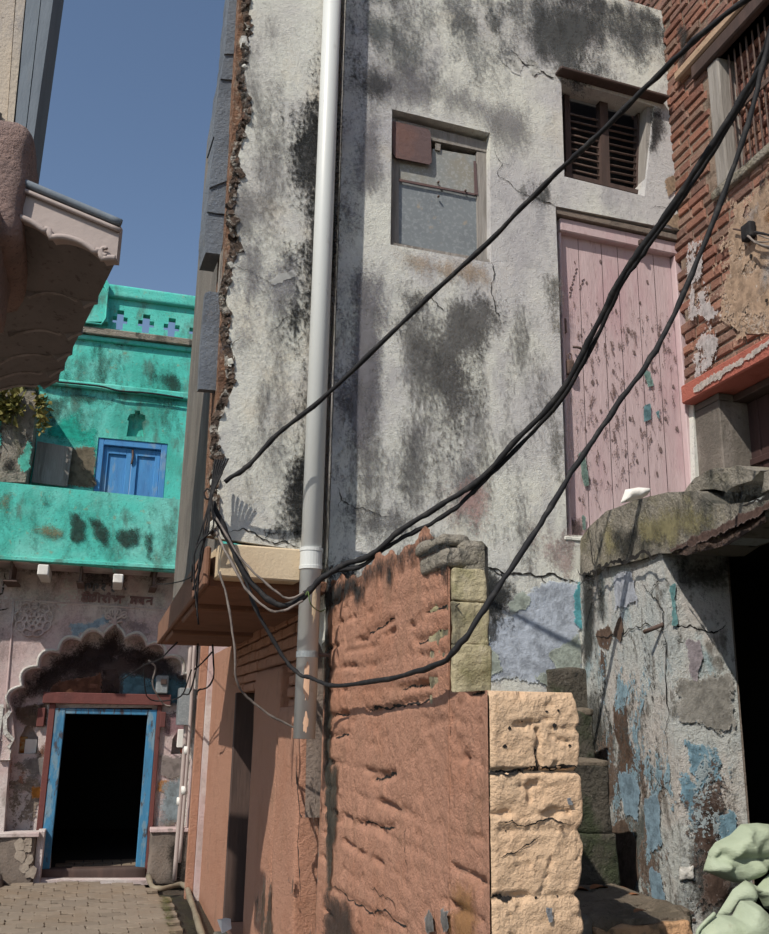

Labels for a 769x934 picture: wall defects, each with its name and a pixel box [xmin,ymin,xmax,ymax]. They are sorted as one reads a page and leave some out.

damp [444,0,665,91]
spalling [207,0,254,537]
damp [235,52,319,414]
peeling [694,163,769,344]
damp [335,268,539,539]
flaking render [35,526,63,538]
damp [70,513,152,560]
damp [256,446,305,543]
crack [488,535,725,738]
peeling [489,570,737,922]
damp [323,892,352,934]
crack [495,817,569,858]